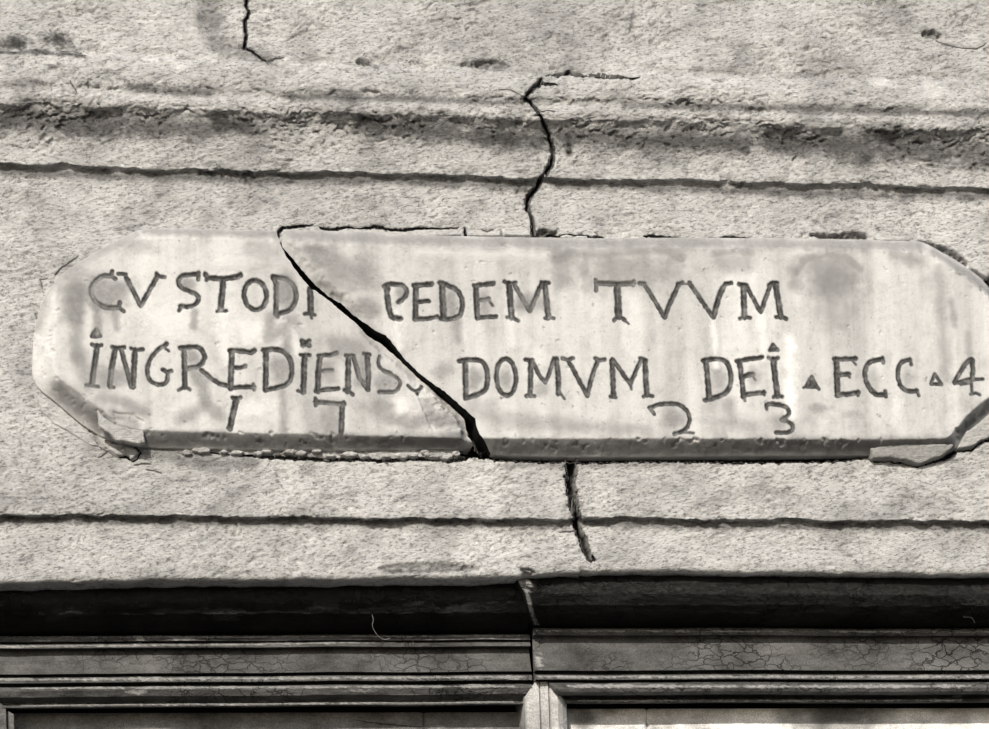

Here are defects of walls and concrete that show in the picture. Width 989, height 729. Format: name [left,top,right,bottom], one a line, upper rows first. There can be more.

crack [242,0,285,63]
crack [277,70,640,239]
crack [211,424,989,562]
spalling [954,430,982,452]